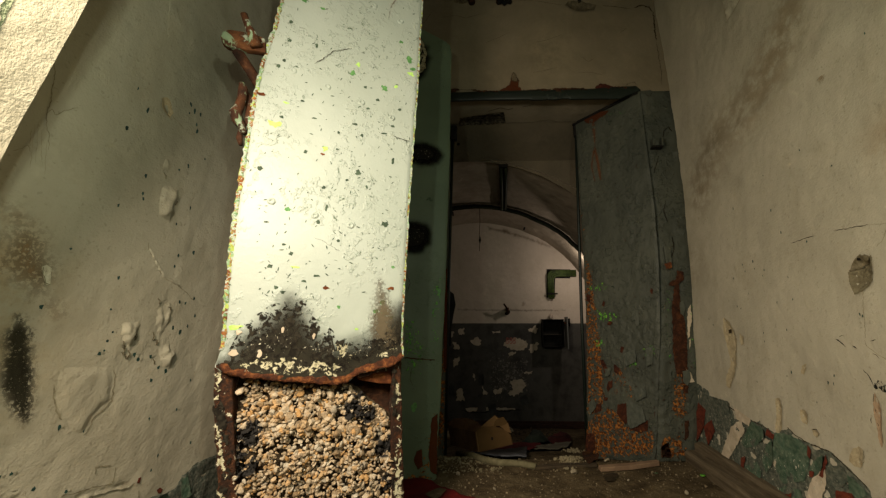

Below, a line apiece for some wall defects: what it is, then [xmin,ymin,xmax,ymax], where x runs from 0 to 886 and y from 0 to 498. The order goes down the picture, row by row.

spalling [0,0,14,27]
rust [219,0,284,350]
peeling [259,178,340,309]
spalling [848,254,873,295]
mould [2,318,33,422]
rust [414,269,448,475]
peeling [451,328,481,367]
peeling [448,371,532,413]
peeling [492,325,539,356]
rust [584,257,696,459]
peeling [696,383,872,498]